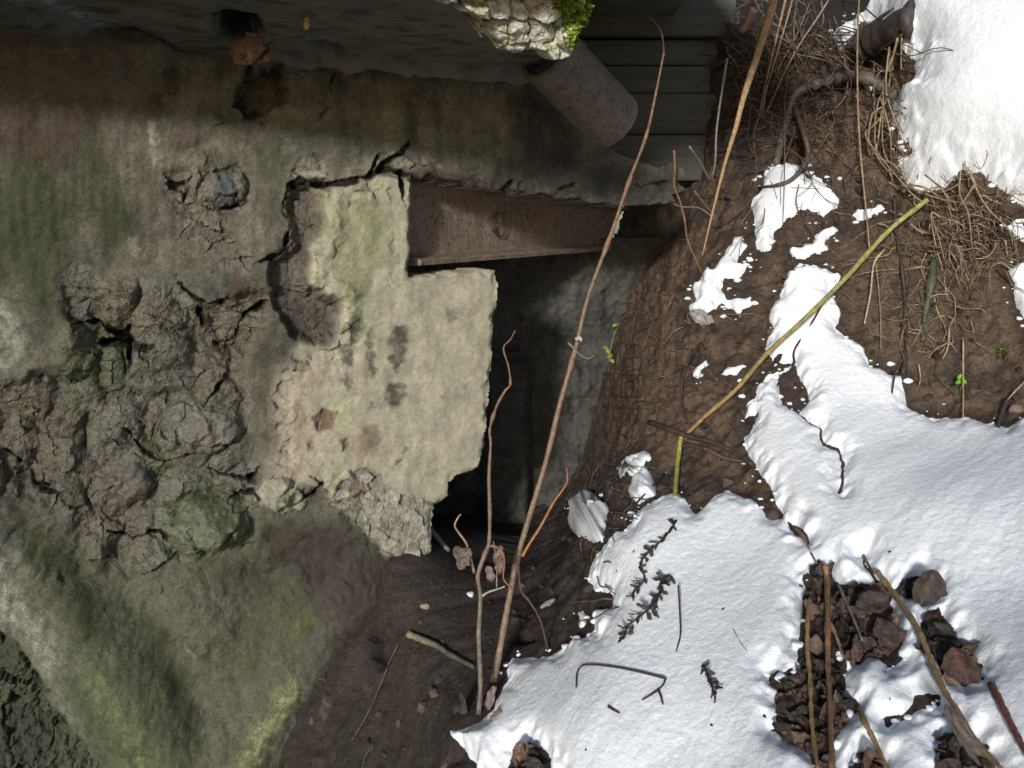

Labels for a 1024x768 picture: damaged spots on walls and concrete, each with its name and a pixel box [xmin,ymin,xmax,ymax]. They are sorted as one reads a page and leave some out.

crack [168,176,244,209]
crack [260,143,582,262]
spalling [0,152,341,578]
spalling [328,467,440,561]
efflorescence [0,557,61,678]